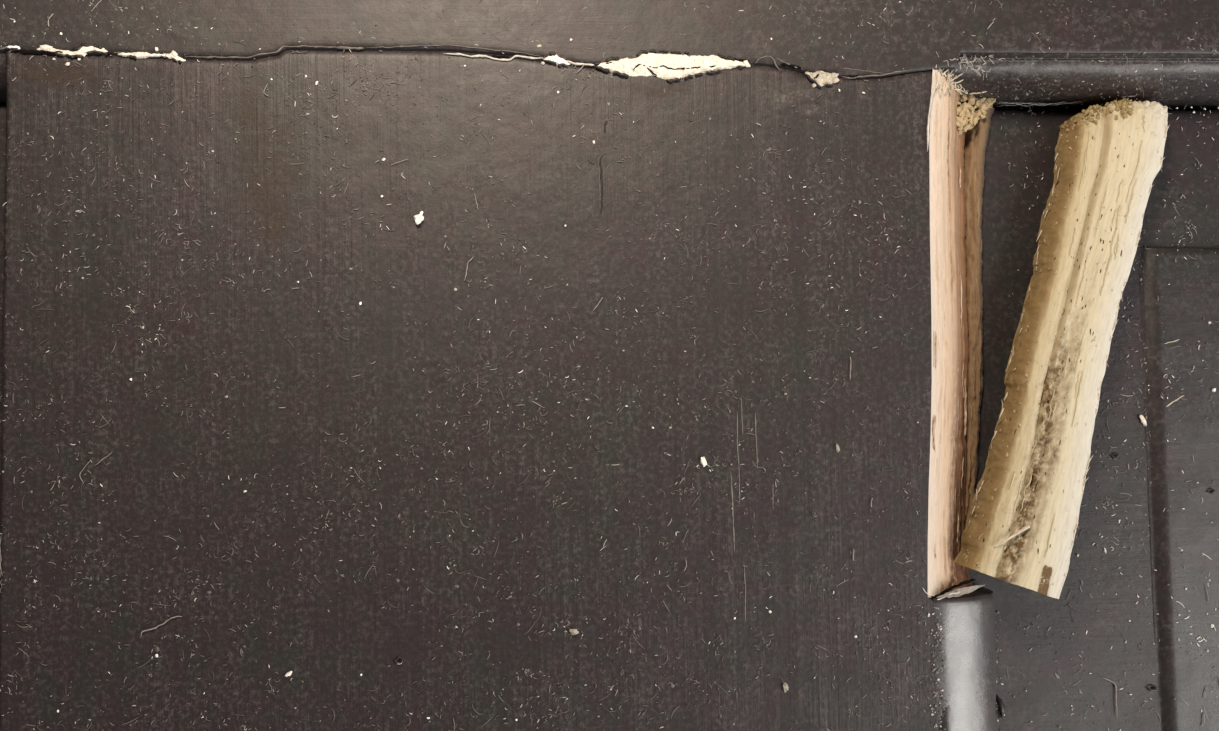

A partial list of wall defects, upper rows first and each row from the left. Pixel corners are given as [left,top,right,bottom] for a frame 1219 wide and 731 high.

crack [0,47,57,56]
crack [186,44,596,66]
peeling [594,49,750,83]
crack [735,56,802,71]
crack [841,68,908,79]